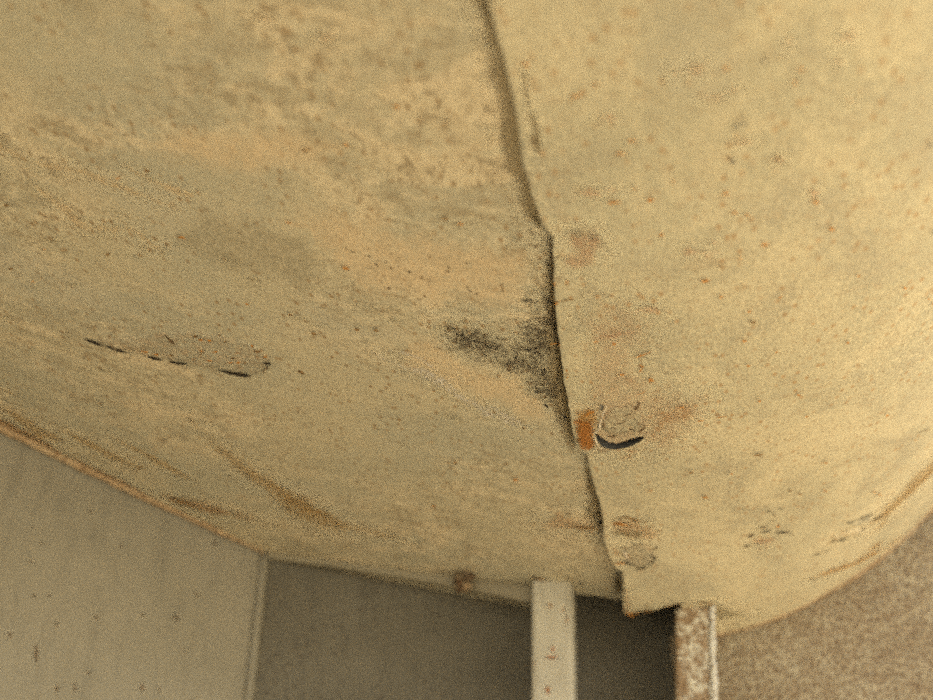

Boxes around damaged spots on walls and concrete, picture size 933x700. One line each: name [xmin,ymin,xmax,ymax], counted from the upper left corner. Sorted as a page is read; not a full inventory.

water stain [143,114,360,184]
water stain [162,185,574,429]
peeling [85,330,271,377]
corrosion [575,411,595,450]
peeling [594,402,645,451]
peeling [622,542,659,570]